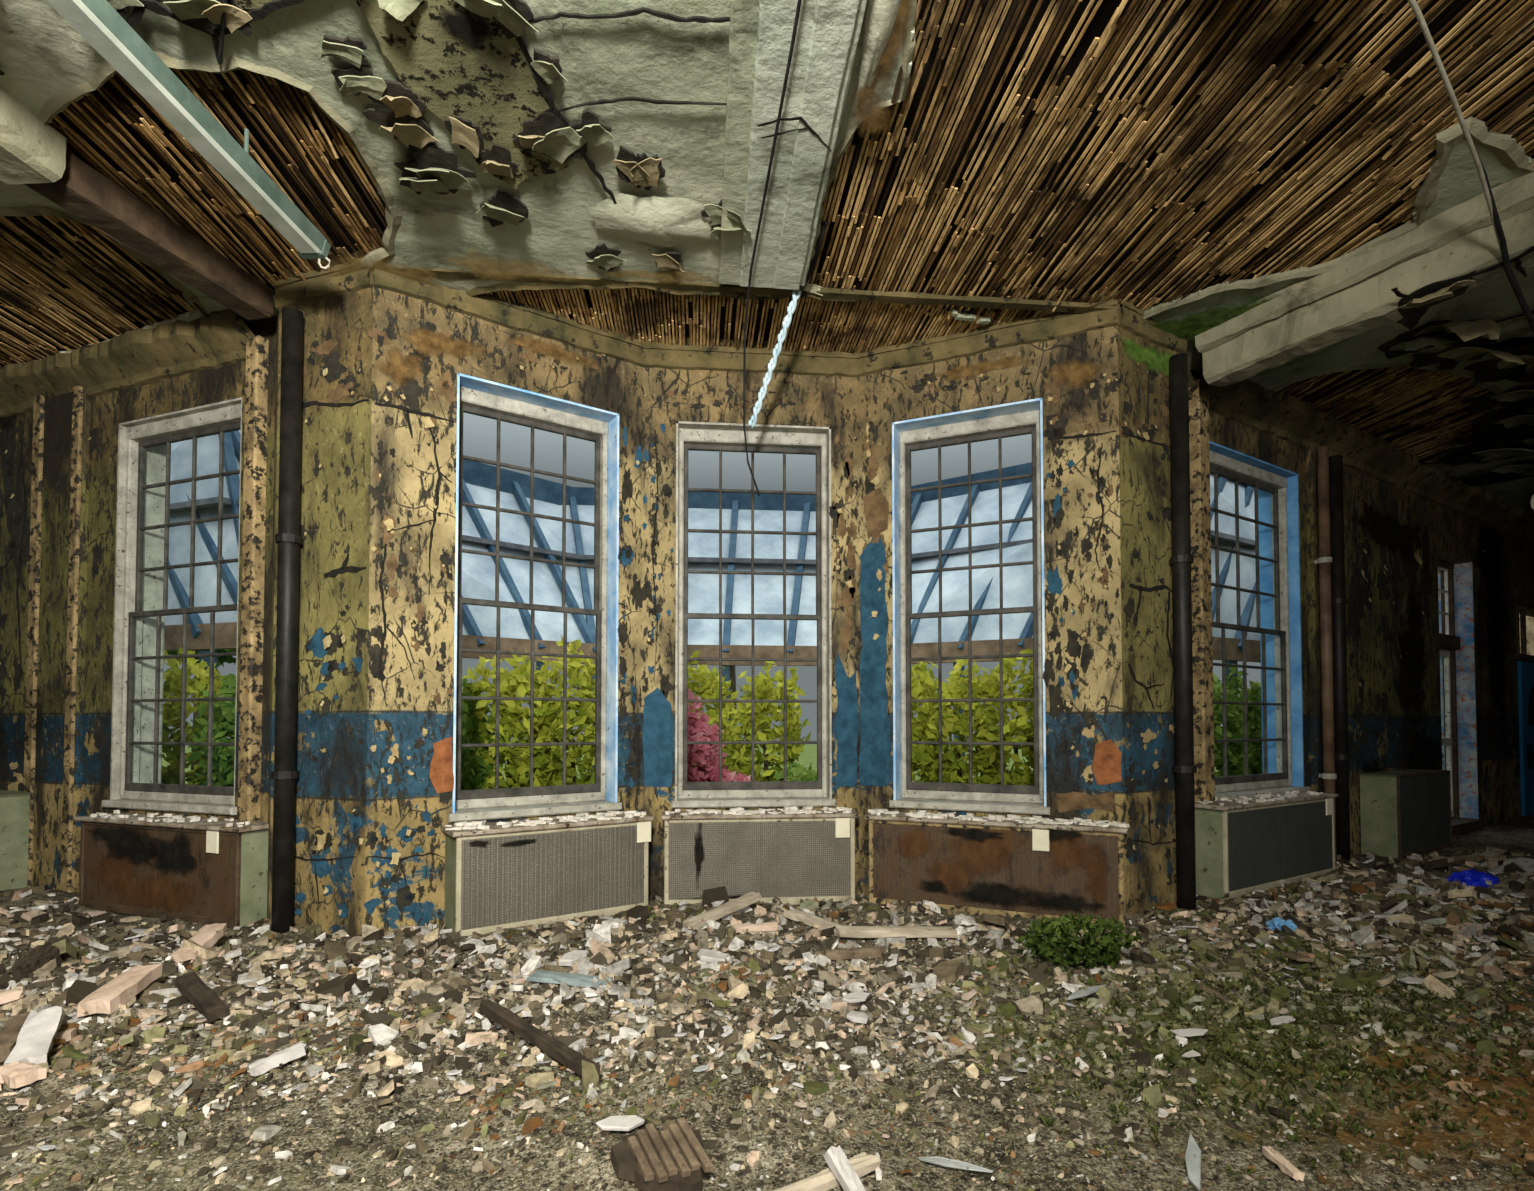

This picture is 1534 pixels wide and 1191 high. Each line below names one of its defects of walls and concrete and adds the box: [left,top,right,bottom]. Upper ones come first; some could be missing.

flaking render [37,34,665,304]
peeling [378,0,425,21]
crack [515,7,730,204]
crack [757,116,831,152]
flaking render [454,0,1534,354]
flaking render [0,206,209,369]
peeling [298,470,453,717]
peeling [829,404,890,787]
peeling [1025,358,1171,720]
peeling [294,726,454,926]
rust [933,832,1012,892]
rust [1051,836,1107,902]